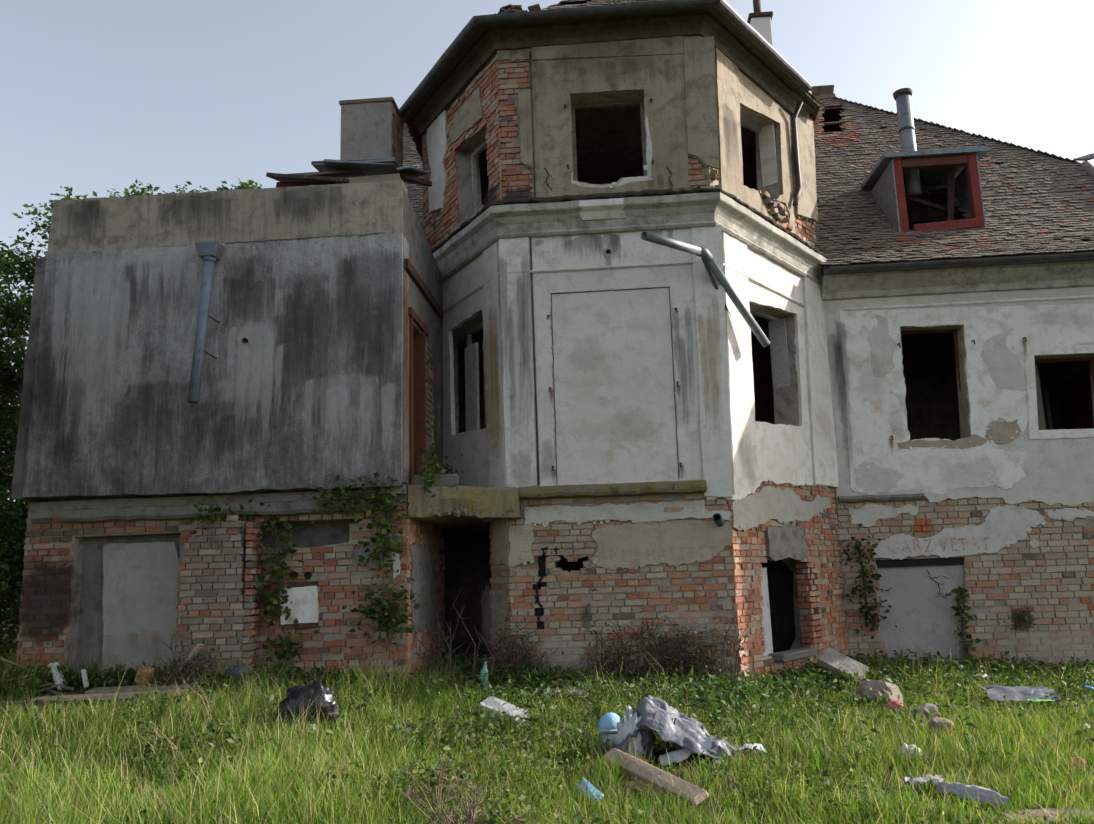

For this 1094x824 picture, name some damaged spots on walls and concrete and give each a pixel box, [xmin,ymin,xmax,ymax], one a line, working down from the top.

peeling [427,110,448,213]
flaking render [497,56,534,200]
flaking render [687,159,721,189]
flaking render [760,191,817,244]
flaking render [985,419,1020,444]
crack [535,547,557,629]
spalling [523,547,600,629]